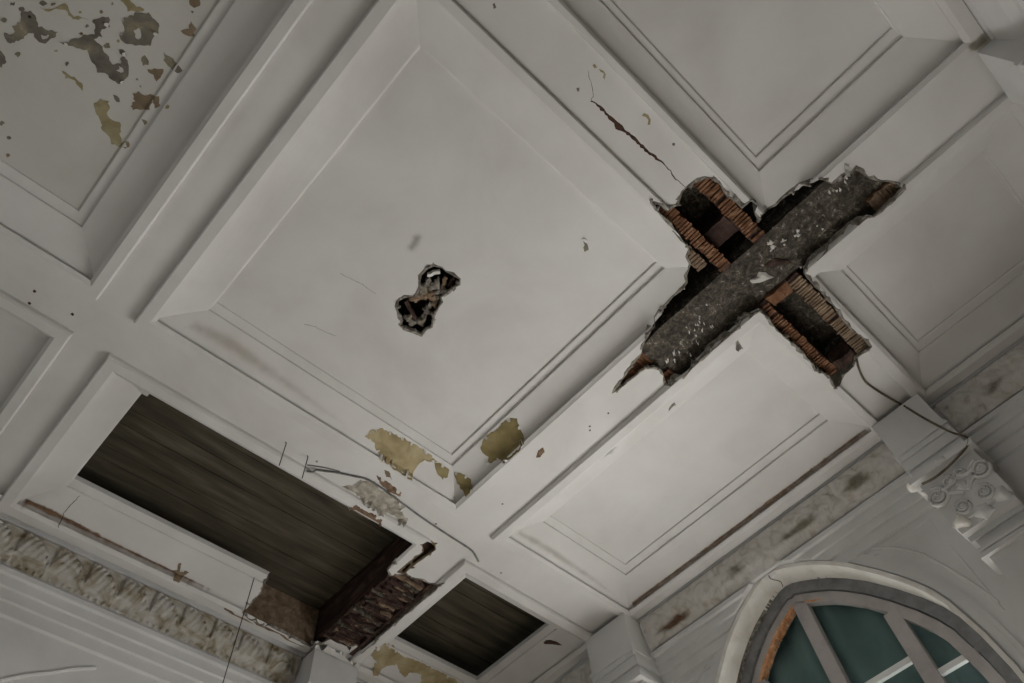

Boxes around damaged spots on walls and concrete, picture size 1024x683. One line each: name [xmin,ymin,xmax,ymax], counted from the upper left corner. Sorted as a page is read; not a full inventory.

peeling [181,0,201,36]
peeling [0,0,183,149]
crack [588,72,685,187]
spalling [395,263,461,337]
peeling [342,428,472,527]
peeling [481,418,524,465]
spalling [397,540,437,574]
peeling [371,643,457,683]